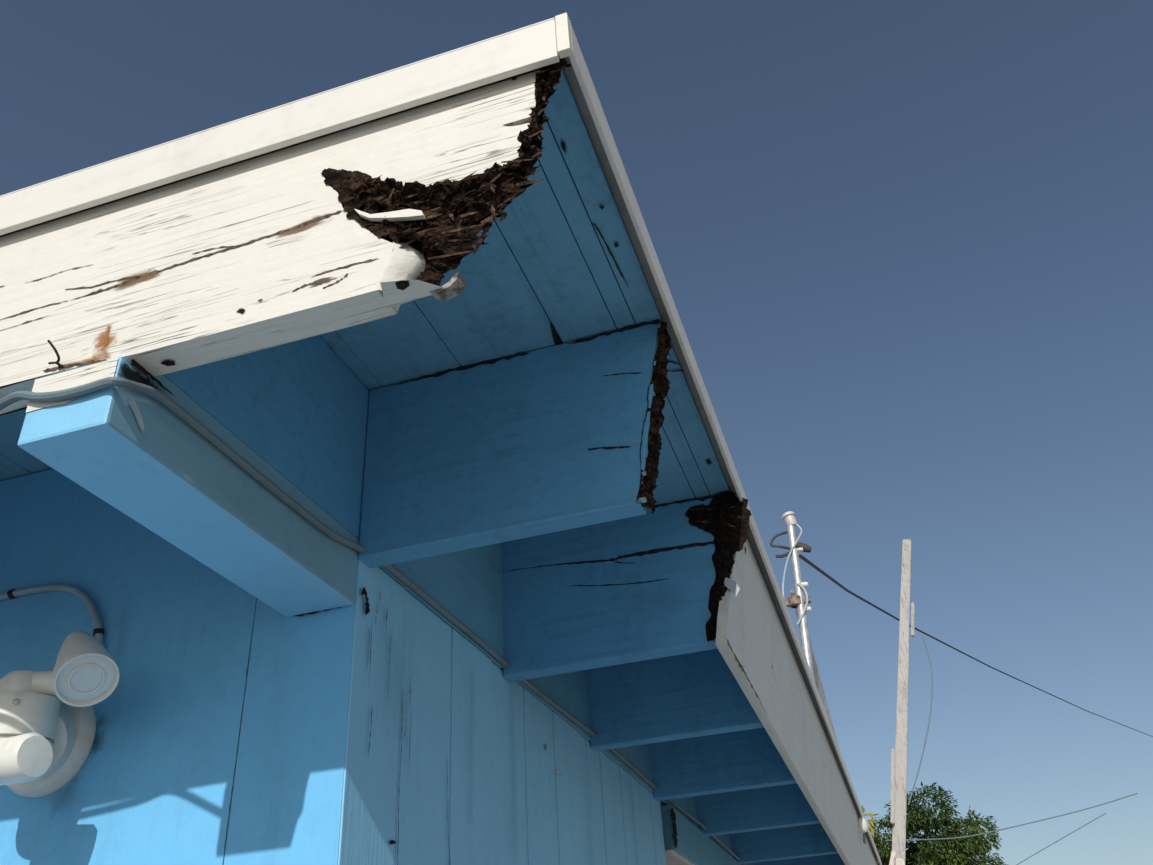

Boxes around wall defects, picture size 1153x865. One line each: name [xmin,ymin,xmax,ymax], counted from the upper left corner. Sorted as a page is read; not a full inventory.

peeling [355,209,426,222]
crack [0,210,343,331]
crack [604,354,684,376]
crack [502,541,714,586]
peeling [724,577,740,597]